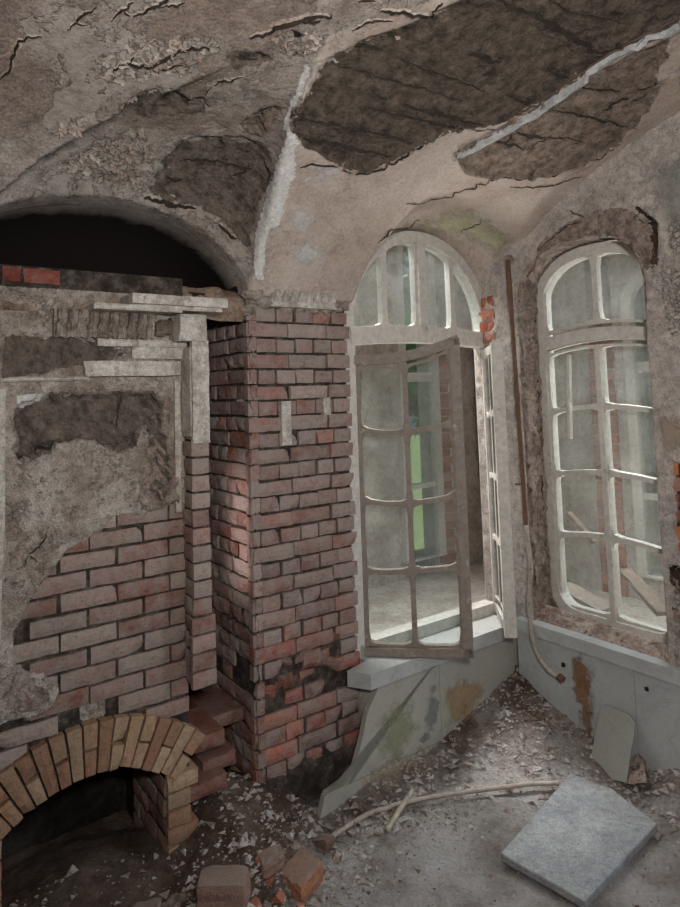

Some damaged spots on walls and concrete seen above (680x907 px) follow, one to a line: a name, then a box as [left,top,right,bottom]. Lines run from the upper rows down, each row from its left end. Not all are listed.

crack [0,34,42,80]
crack [66,0,186,32]
crack [112,45,210,73]
peeling [95,34,273,86]
crack [205,76,243,96]
peeling [271,30,328,59]
spalling [57,105,281,252]
crack [378,143,620,242]
spalling [526,206,680,336]
spalling [13,388,180,512]
flaking render [669,462,680,666]
corrosion [572,657,593,734]